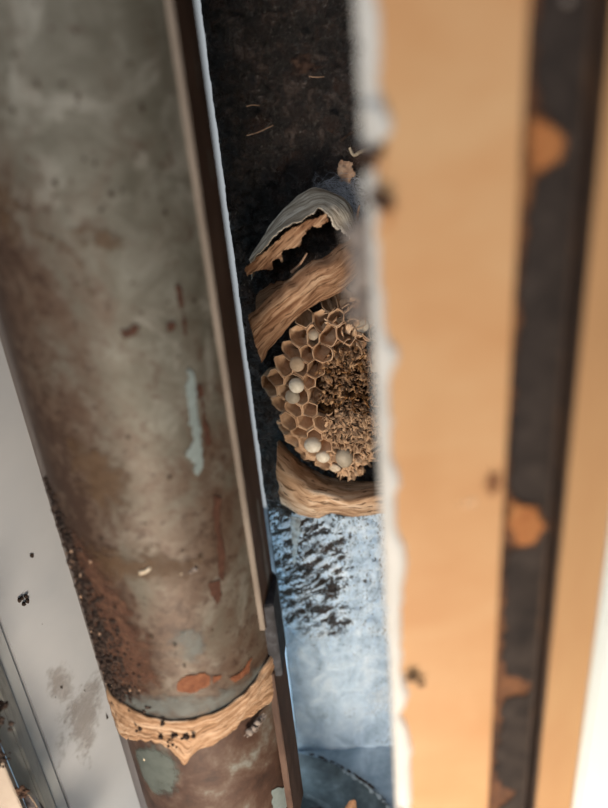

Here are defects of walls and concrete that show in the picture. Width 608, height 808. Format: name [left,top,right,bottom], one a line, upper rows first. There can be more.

corrosion [120,323,139,339]
corrosion [167,284,187,335]
peeling [185,369,203,476]
corrosion [197,384,212,445]
corrosion [208,496,226,604]
corrosion [177,658,252,694]